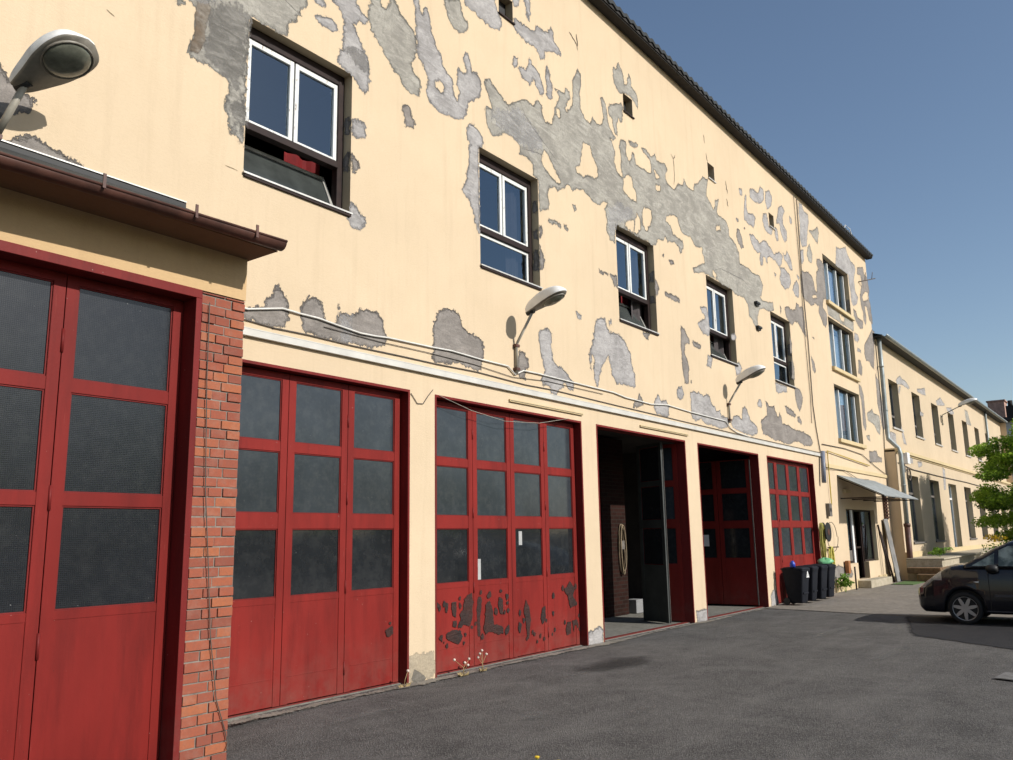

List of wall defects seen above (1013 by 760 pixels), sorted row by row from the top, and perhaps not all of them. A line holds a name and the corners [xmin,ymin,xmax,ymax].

flaking render [0,62,37,118]
flaking render [5,133,84,167]
flaking render [177,0,907,463]
peeling [437,582,580,648]